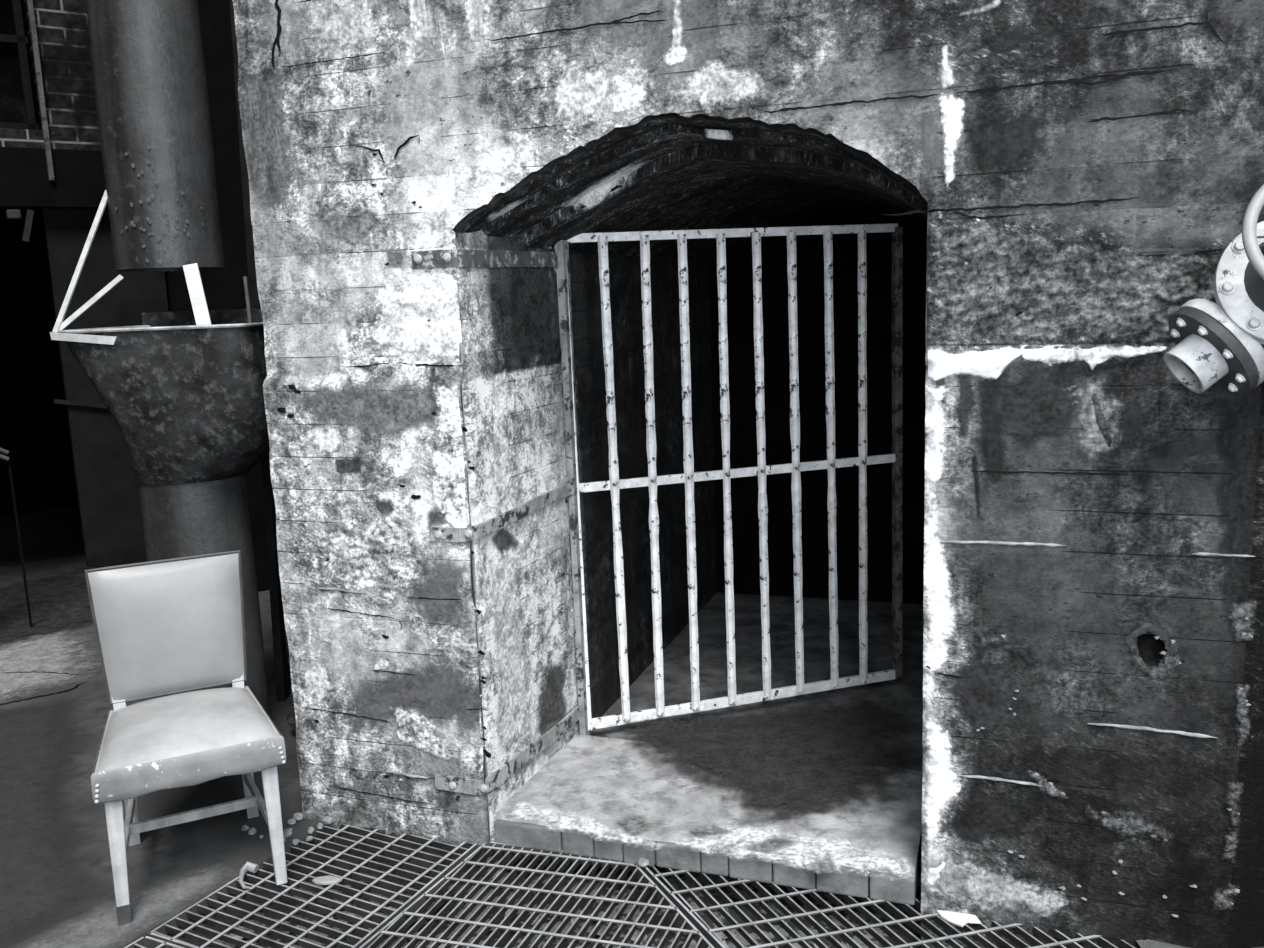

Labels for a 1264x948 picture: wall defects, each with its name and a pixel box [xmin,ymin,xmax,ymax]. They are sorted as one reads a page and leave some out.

crack [271,0,384,69]
water stain [664,0,687,65]
water stain [963,0,1000,14]
water stain [984,27,1029,52]
water stain [671,62,764,109]
water stain [913,46,1038,182]
spalling [931,222,1218,343]
water stain [923,345,1166,917]
spalling [1131,636,1181,680]
water stain [624,697,908,874]